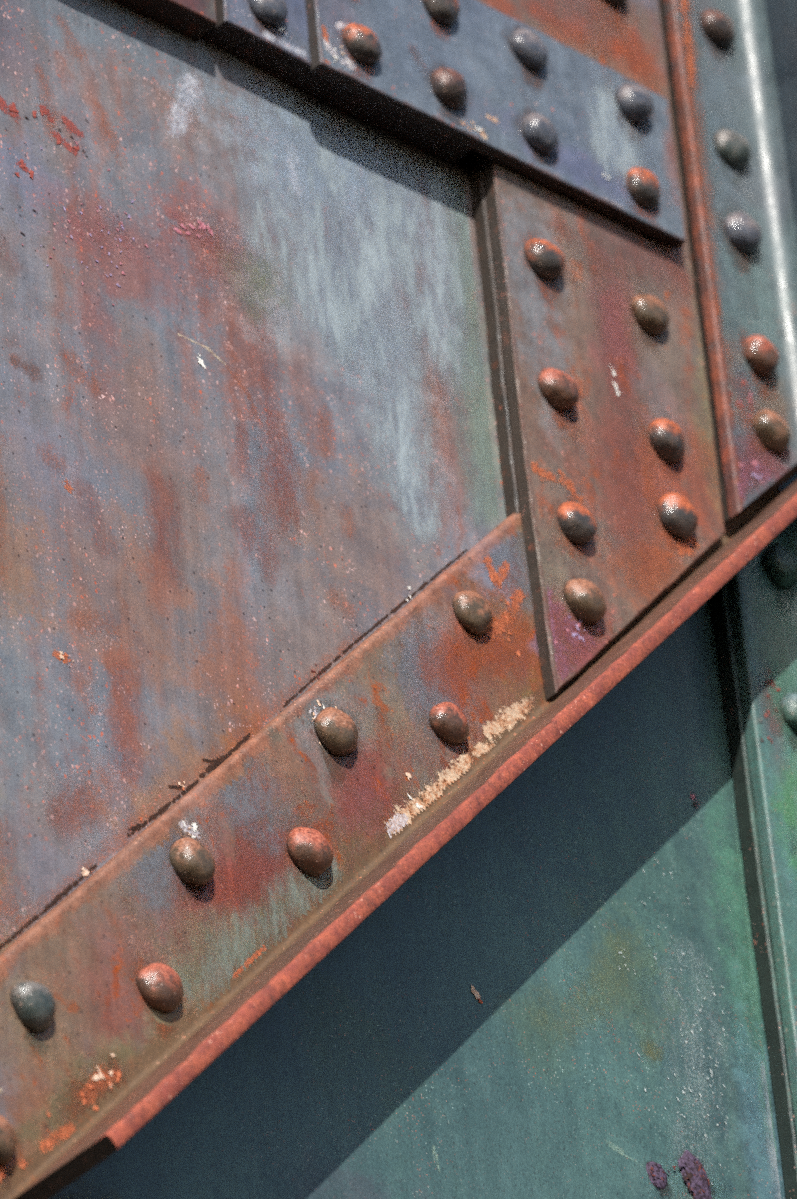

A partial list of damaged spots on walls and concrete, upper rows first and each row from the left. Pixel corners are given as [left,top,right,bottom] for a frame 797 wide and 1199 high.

peeling [0,98,89,157]
peeling [15,154,34,179]
peeling [40,199,158,287]
rust [531,461,585,503]
rust [482,554,525,657]
rust [53,650,74,664]
peeling [385,696,534,838]